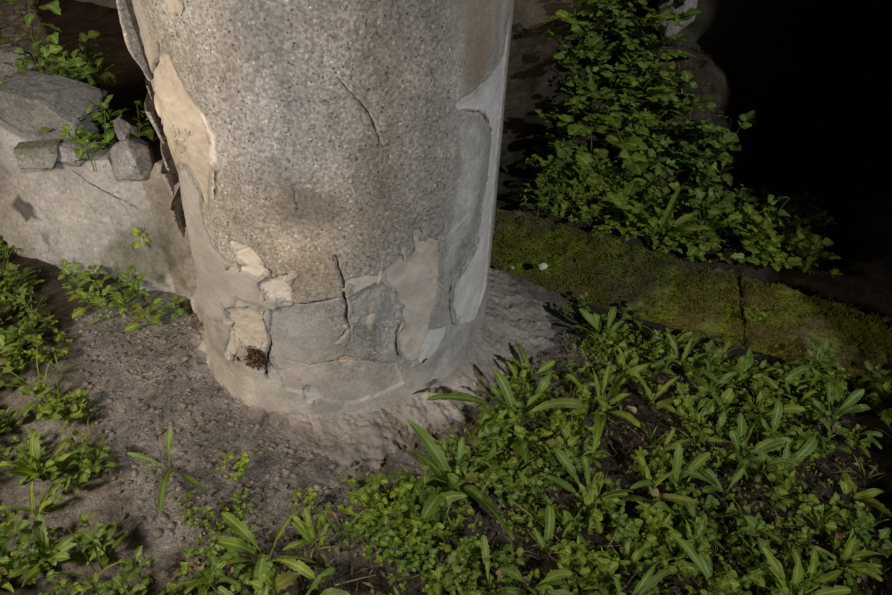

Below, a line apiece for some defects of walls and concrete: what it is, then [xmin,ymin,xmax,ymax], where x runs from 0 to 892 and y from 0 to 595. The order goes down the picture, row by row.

peeling [116,0,212,238]
spalling [219,240,298,363]
crack [338,78,380,144]
peeling [341,22,509,368]